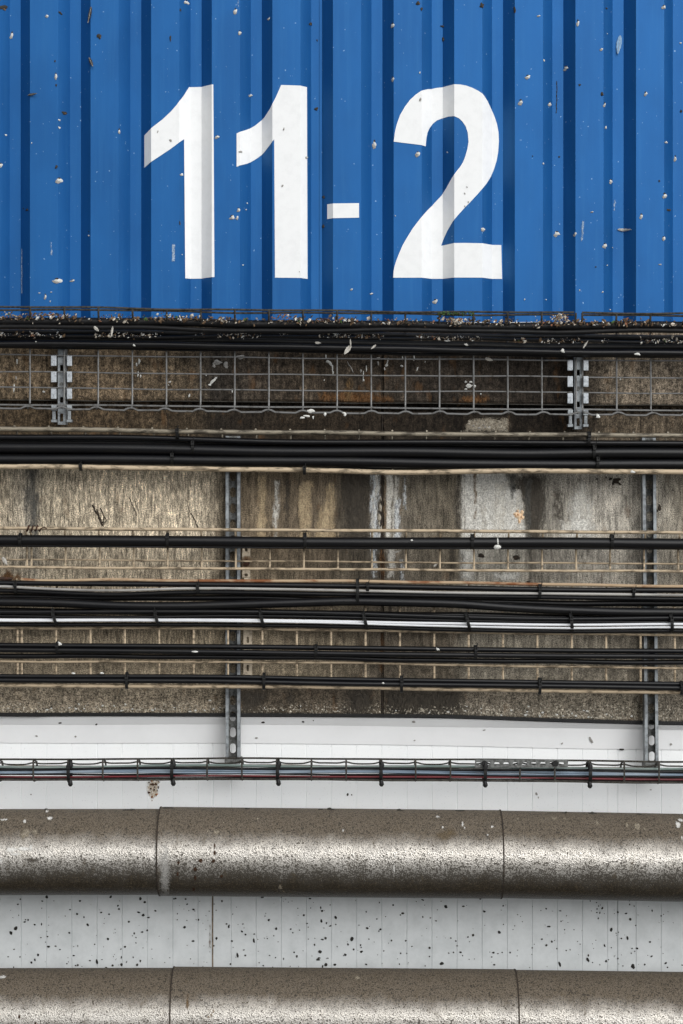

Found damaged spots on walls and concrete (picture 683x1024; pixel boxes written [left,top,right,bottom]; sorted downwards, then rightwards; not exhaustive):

water stain [256,472,406,579]